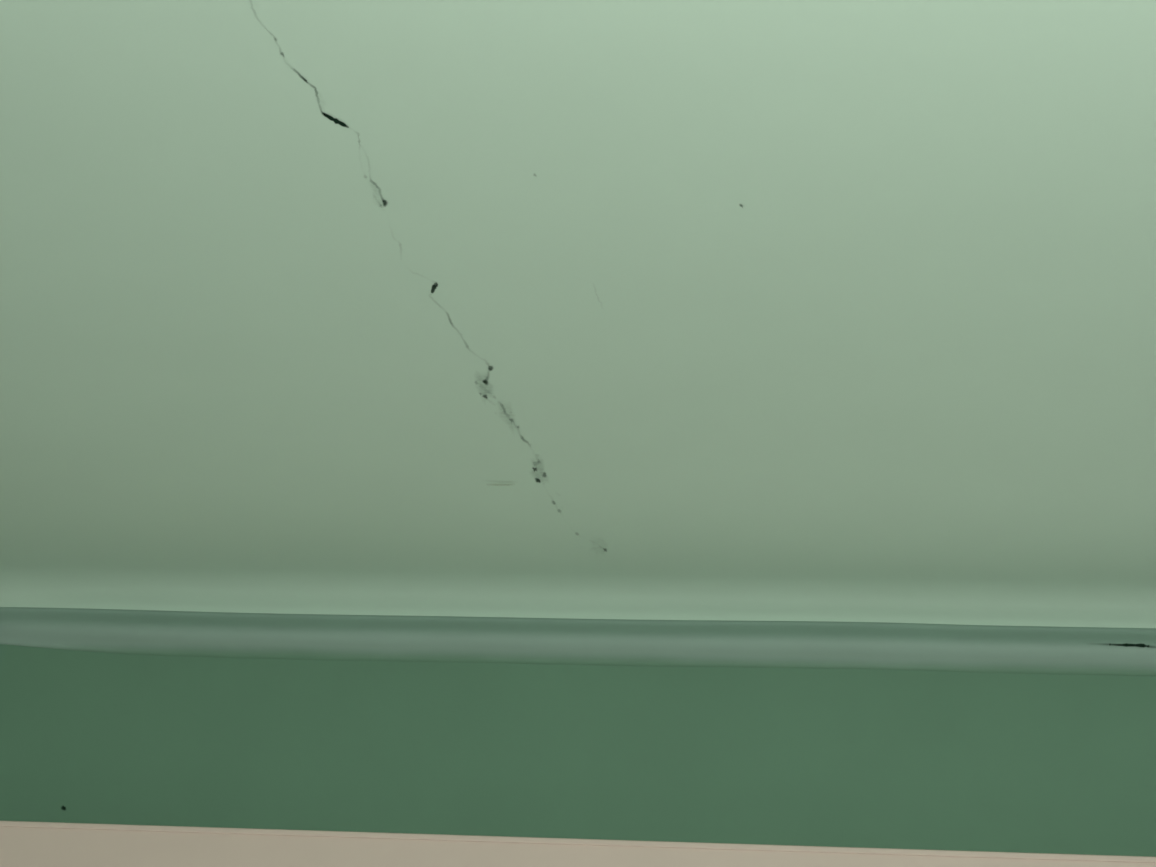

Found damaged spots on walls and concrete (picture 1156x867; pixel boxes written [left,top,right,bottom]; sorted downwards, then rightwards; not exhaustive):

crack [322,113,348,128]